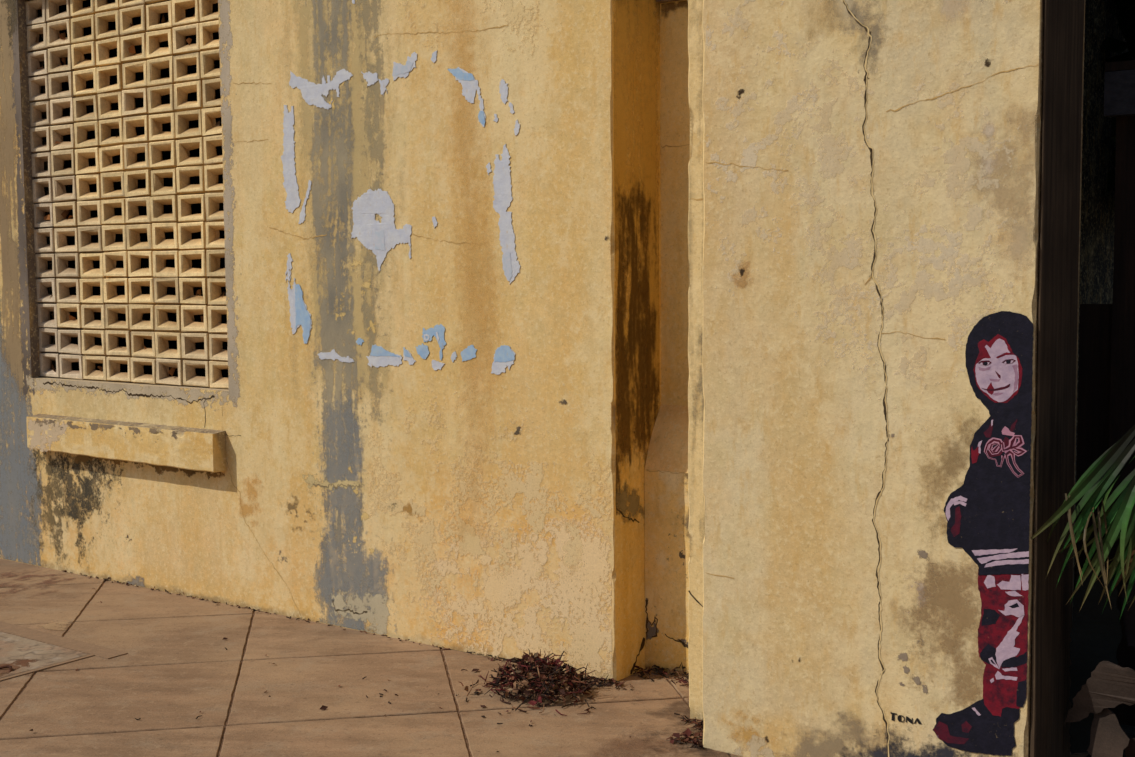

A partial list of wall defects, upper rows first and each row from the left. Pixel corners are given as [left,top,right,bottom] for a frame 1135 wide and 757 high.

water stain [1,0,17,46]
water stain [0,312,123,566]
water stain [310,0,659,678]
crack [843,0,1037,757]